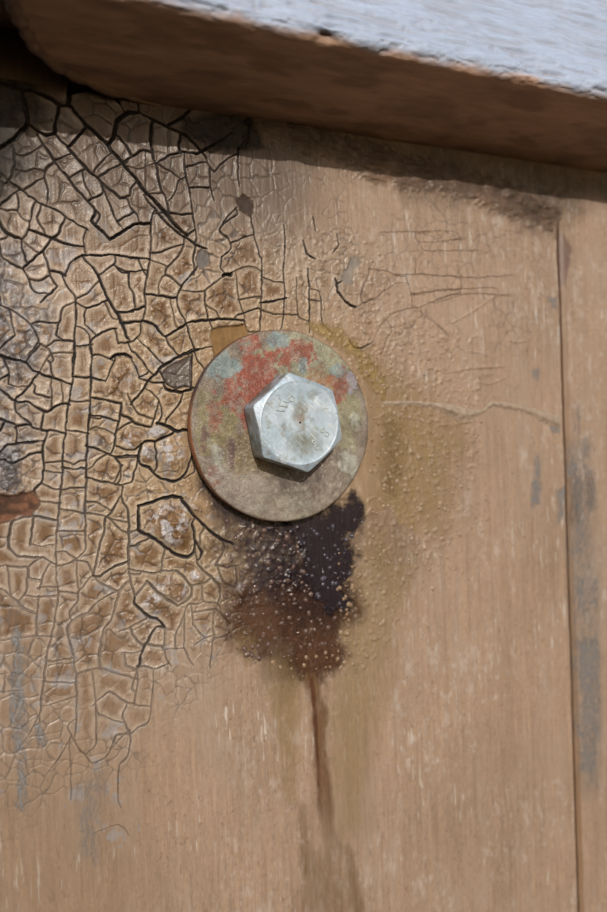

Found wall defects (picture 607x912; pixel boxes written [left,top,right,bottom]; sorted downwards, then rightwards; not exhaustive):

crack [0,87,515,835]
rust [309,323,385,400]
rust [200,479,364,811]